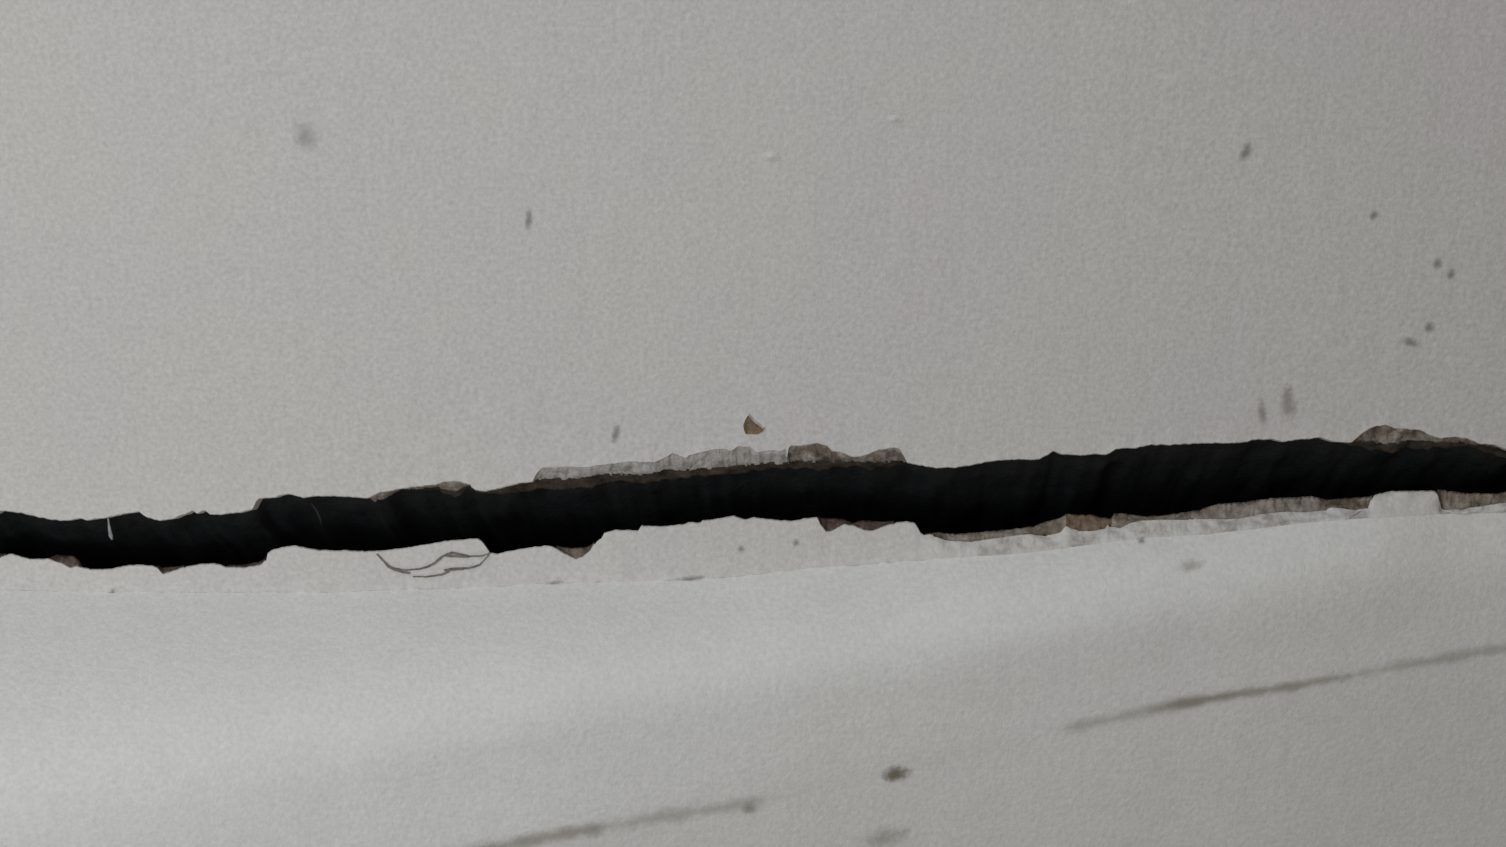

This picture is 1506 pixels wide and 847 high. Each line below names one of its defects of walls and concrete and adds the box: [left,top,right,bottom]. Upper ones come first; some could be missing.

crack [0,425,1506,593]